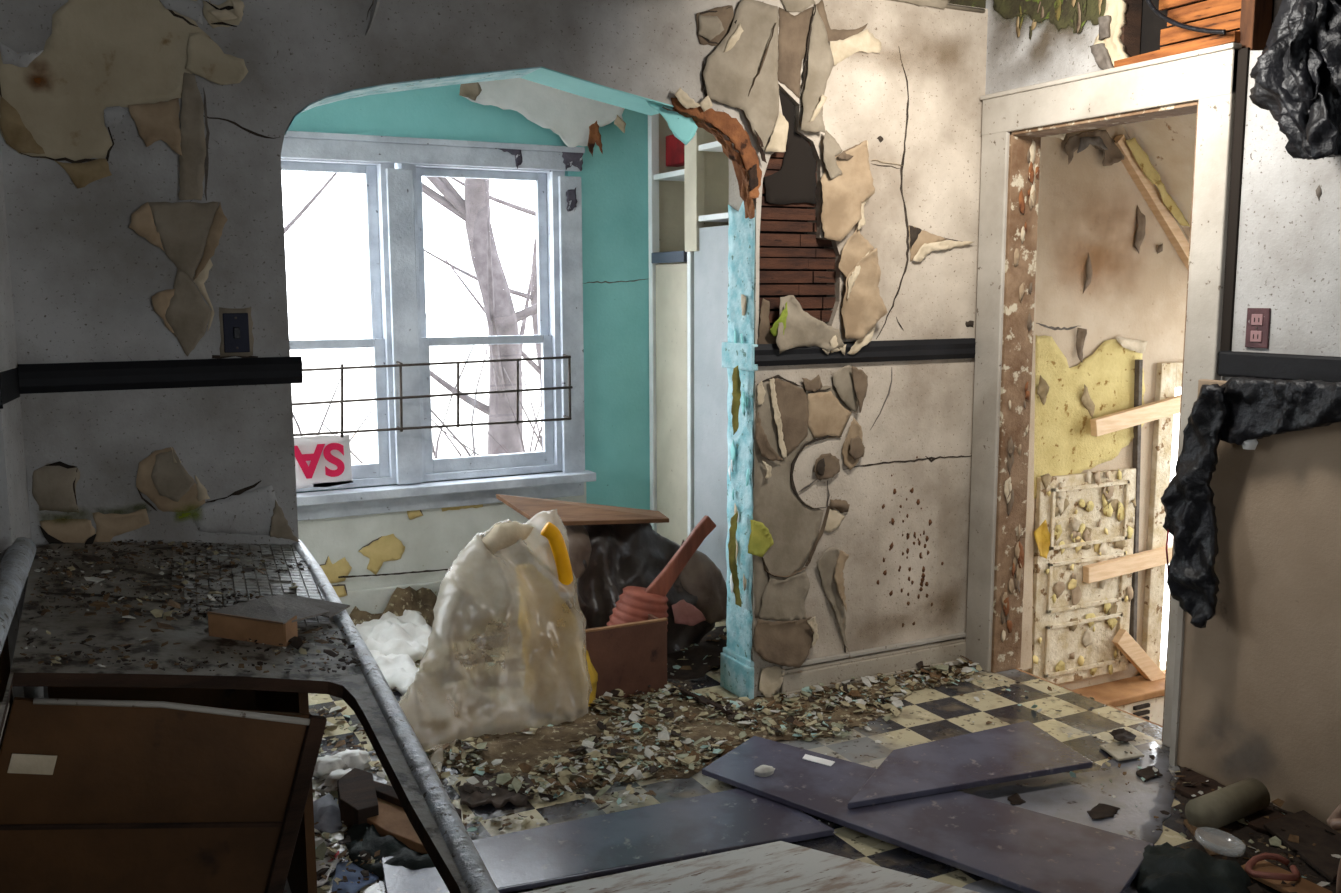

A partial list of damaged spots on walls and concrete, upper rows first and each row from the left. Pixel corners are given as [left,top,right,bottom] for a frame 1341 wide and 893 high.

flaking render [696,5,734,46]
spalling [993,0,1282,70]
flaking render [459,78,626,171]
peeling [645,100,698,145]
flaking render [0,0,254,357]
flaking render [727,0,836,344]
crack [871,46,910,339]
crack [870,369,892,430]
peeling [726,366,852,661]
crack [843,455,972,470]
peeling [1001,282,1148,676]
peeling [320,534,405,597]